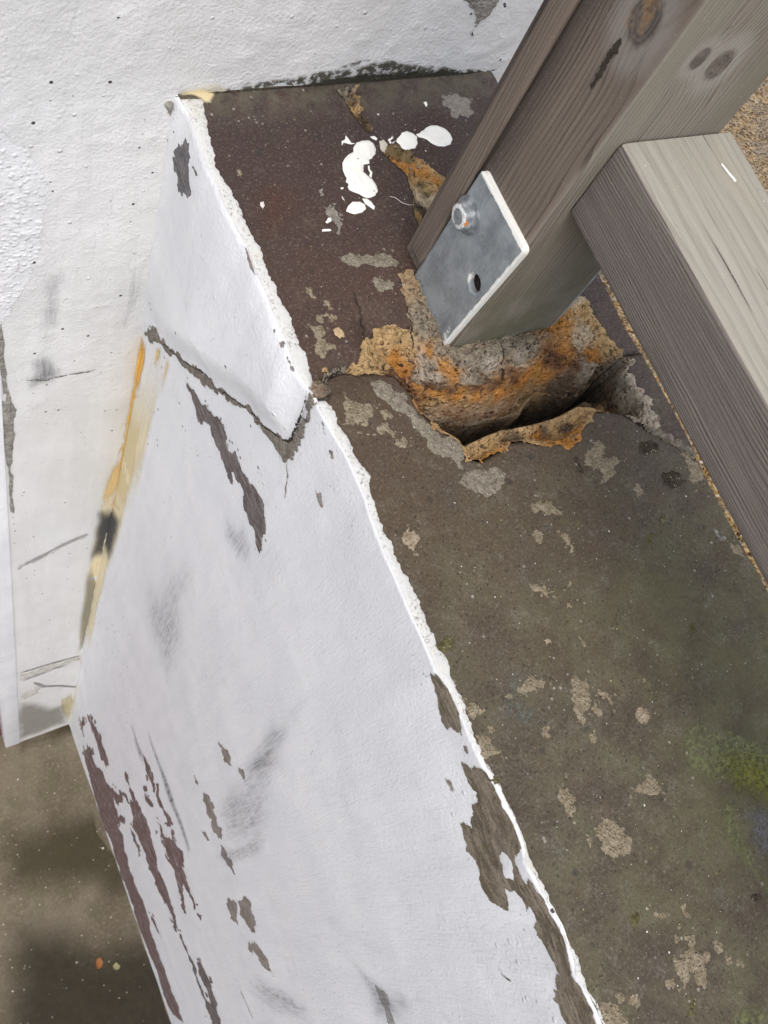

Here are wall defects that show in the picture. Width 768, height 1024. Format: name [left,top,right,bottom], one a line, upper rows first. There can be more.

peeling [167,131,197,199]
spalling [306,248,706,498]
peeling [186,377,266,554]
peeling [78,714,221,1024]
peeling [194,776,235,875]
peeling [218,743,246,783]
peeling [226,896,274,976]
peeling [430,670,641,1024]